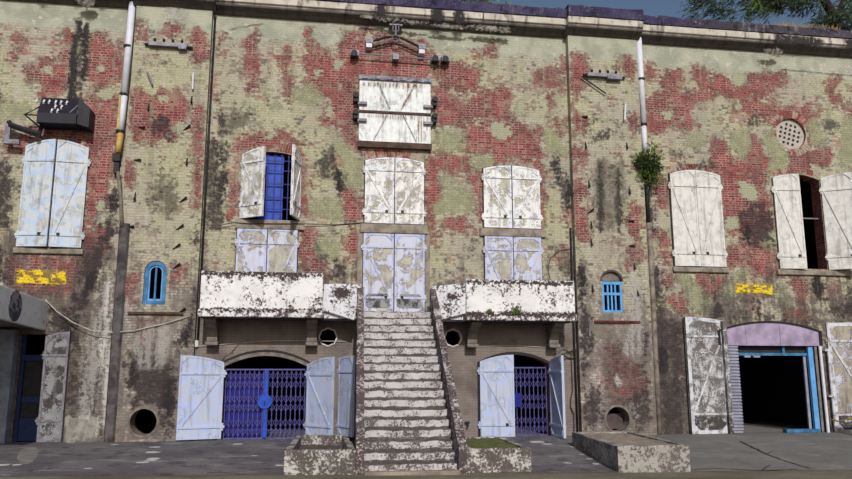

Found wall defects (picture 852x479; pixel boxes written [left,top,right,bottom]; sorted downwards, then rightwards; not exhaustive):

peeling [3,27,139,297]
damp [66,18,90,100]
peeling [129,87,206,209]
damp [193,99,229,244]
peeling [277,13,550,249]
peeling [532,51,591,243]
peeling [614,54,832,324]
damp [47,188,119,437]
damp [173,283,321,351]
damp [196,259,346,288]
peeling [298,229,353,300]
damp [122,344,178,441]